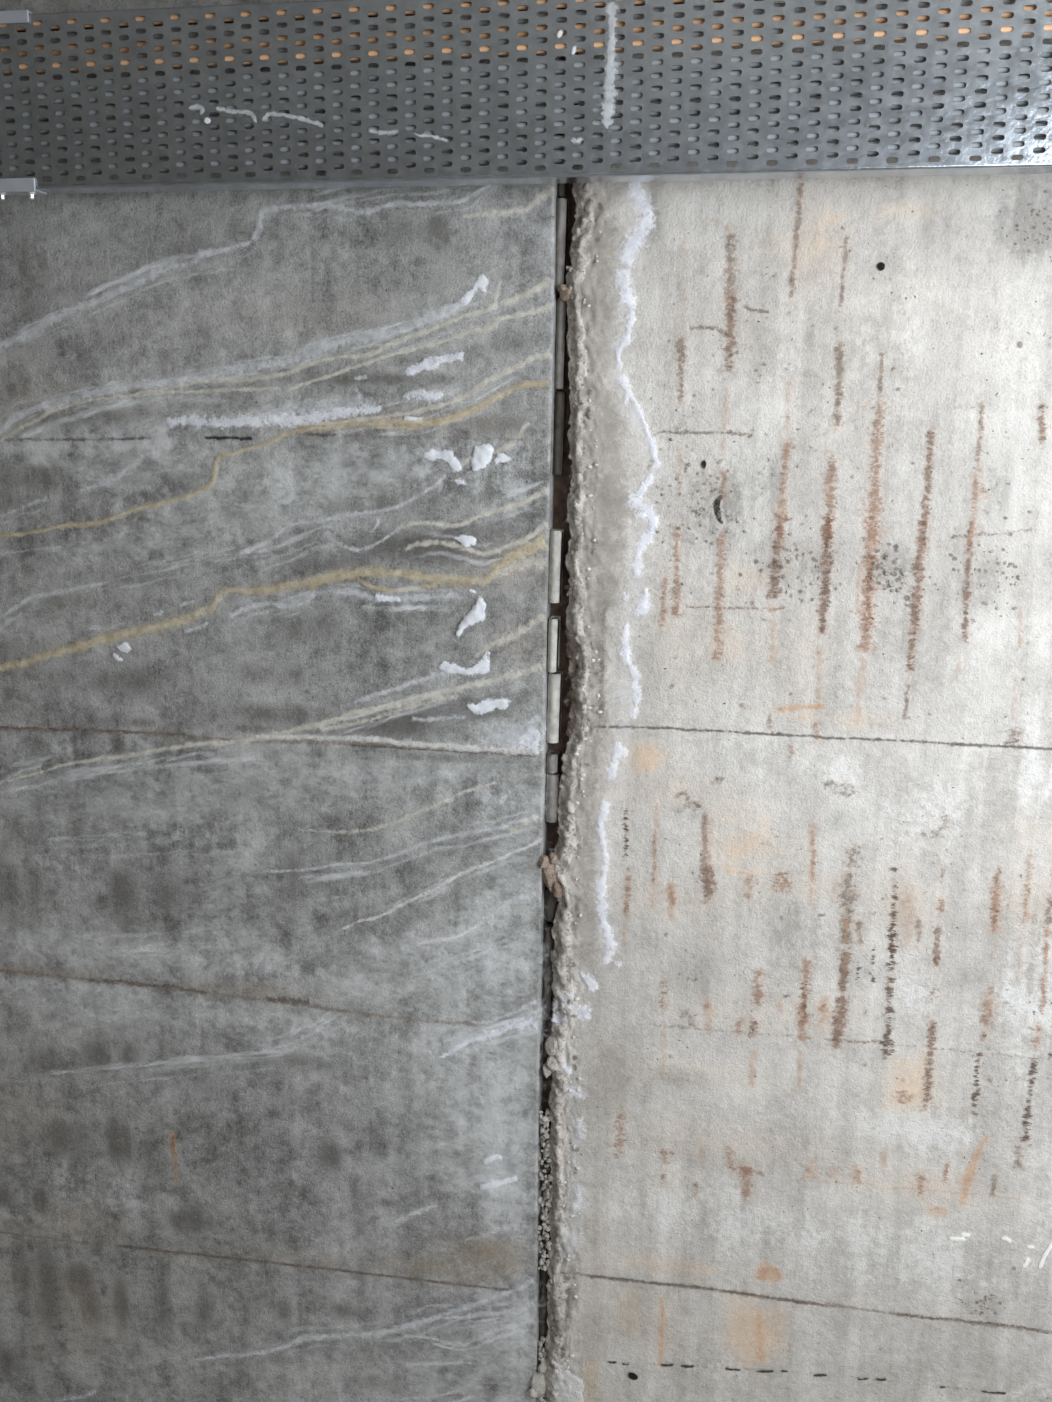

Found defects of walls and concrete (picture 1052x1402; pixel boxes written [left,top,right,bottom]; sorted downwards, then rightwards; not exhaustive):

corrosion [654,234,769,462]
damp [2,664,541,782]
damp [441,182,660,1058]
corrosion [661,416,812,659]
corrosion [812,326,900,650]
corrosion [904,431,935,718]
corrosion [952,511,1031,642]
corrosion [692,815,717,903]
corrosion [784,843,901,1059]
damp [562,1064,582,1098]
corrosion [897,1022,937,1107]
corrosion [1014,1027,1040,1168]